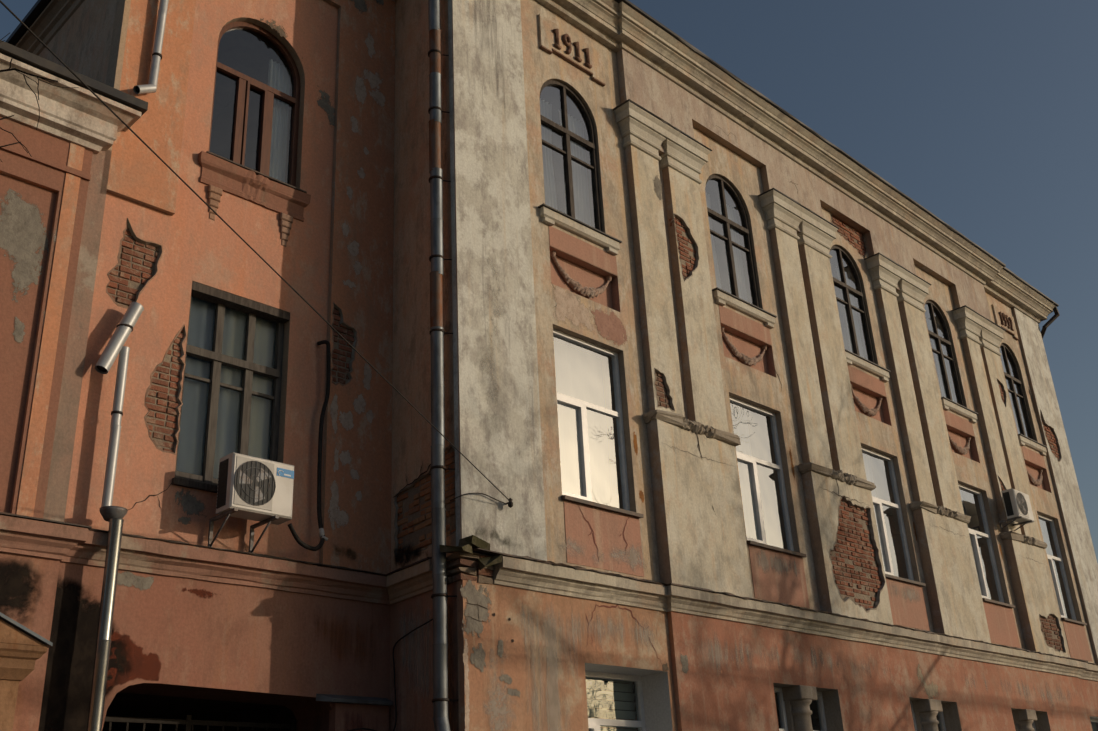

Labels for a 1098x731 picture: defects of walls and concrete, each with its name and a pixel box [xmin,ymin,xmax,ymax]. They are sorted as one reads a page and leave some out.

flaking render [653,175,662,201]
flaking render [669,213,699,282]
flaking render [144,325,188,455]
peeling [328,302,374,530]
flaking render [654,368,675,412]
flaking render [394,470,432,555]
flaking render [445,445,456,537]
flaking render [829,495,885,613]
flaking render [1039,613,1066,653]